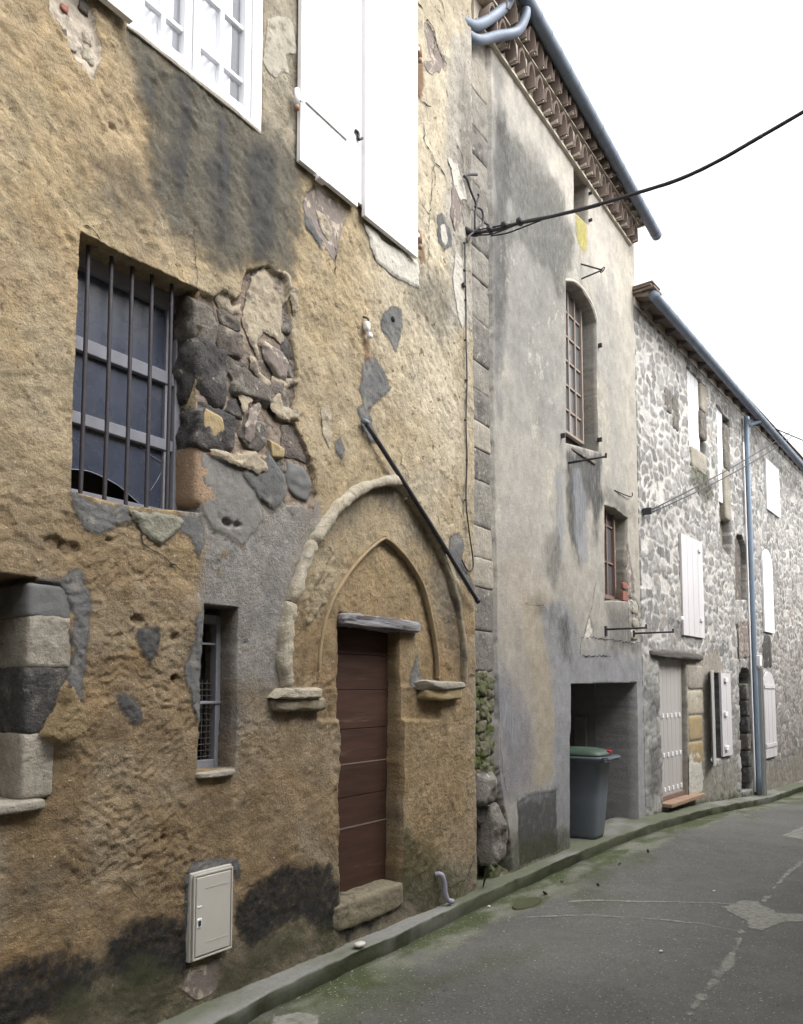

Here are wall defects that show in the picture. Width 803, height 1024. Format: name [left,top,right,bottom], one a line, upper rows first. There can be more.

flaking render [49,0,102,79]
peeling [263,16,296,77]
flaking render [424,22,447,74]
water stain [128,31,301,274]
flaking render [303,186,346,261]
flaking render [130,266,317,545]
water stain [558,452,603,560]
water stain [235,864,390,947]
water stain [0,916,190,1024]